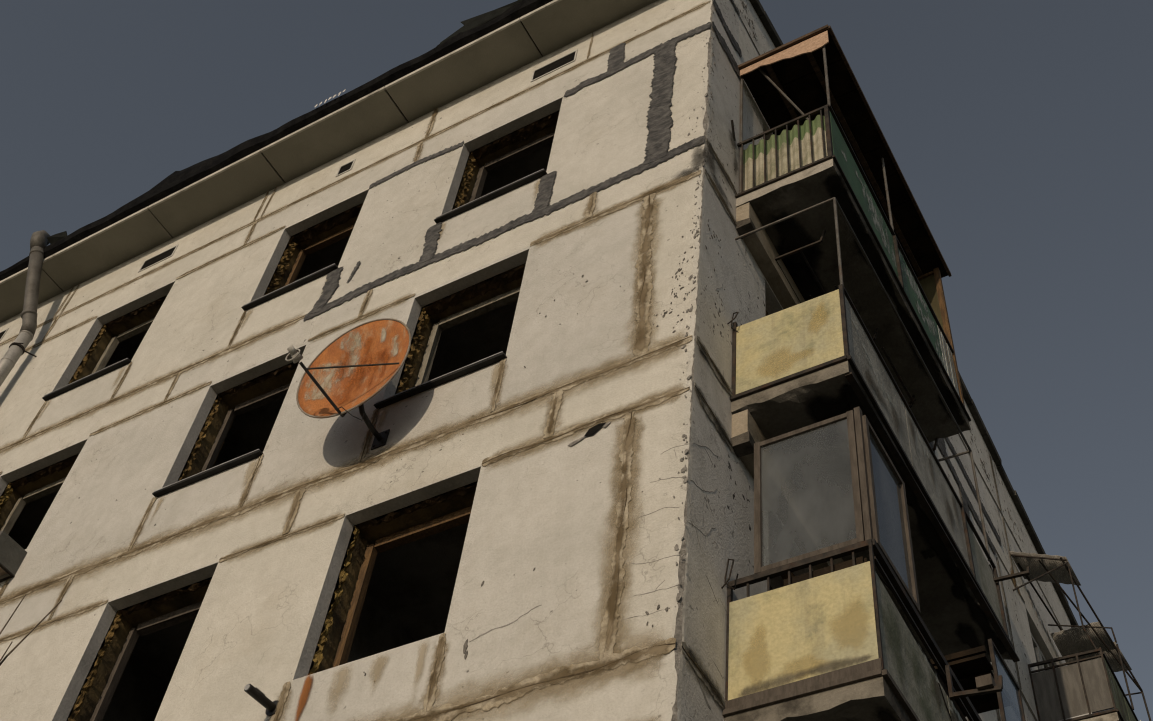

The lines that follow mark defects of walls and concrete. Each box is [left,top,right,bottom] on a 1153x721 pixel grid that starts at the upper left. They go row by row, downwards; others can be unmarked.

damp [26,5,702,351]
crack [533,140,737,310]
damp [537,132,738,281]
damp [0,283,682,721]
crack [0,336,733,721]
damp [742,656,869,696]